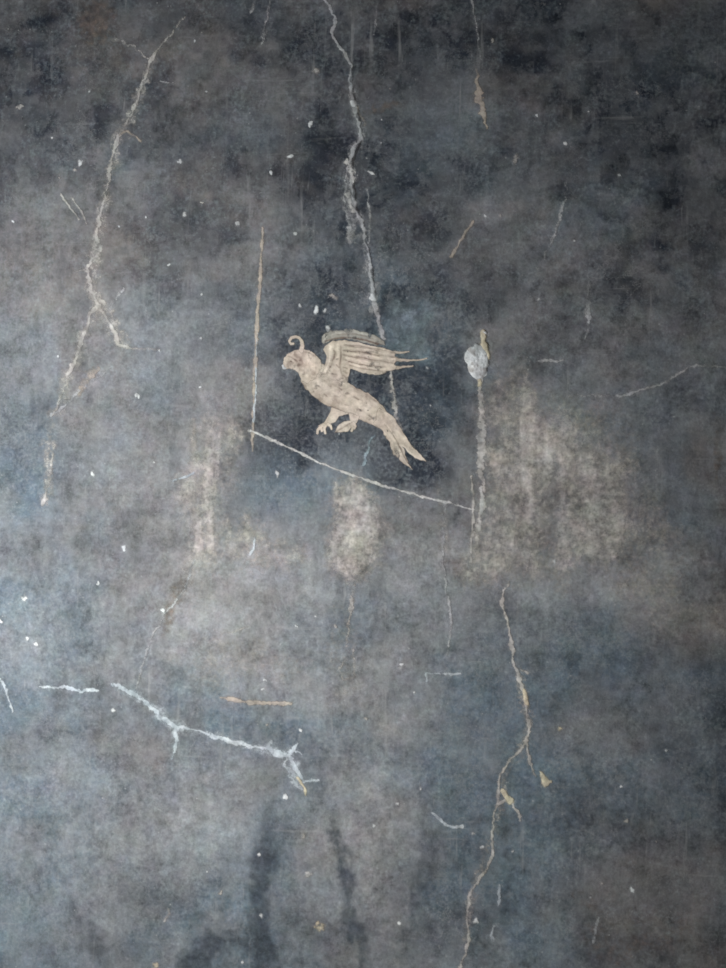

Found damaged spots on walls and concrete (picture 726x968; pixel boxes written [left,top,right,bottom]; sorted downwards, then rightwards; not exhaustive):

crack [48,17,185,417]
crack [324,0,386,340]
crack [41,441,56,505]
crack [389,371,401,425]
crack [39,559,320,796]
crack [458,553,552,968]
leakage [246,839,277,968]